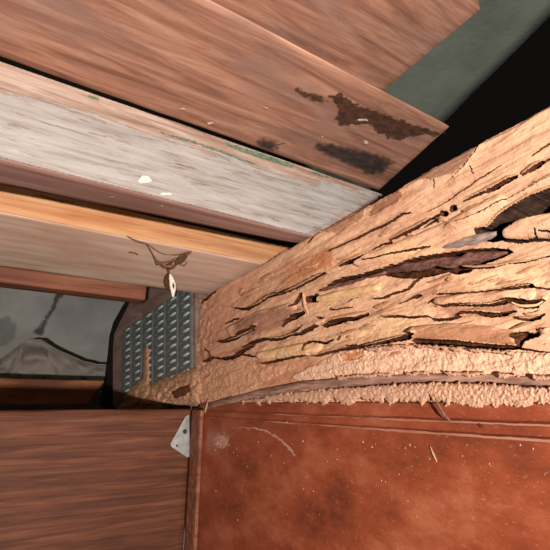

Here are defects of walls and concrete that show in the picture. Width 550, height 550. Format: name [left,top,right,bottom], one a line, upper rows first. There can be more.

damp [295,87,445,141]
damp [316,144,391,174]
crack [428,146,501,212]
crack [449,173,550,223]
crack [328,212,411,252]
crack [452,255,550,274]
crack [203,279,550,364]